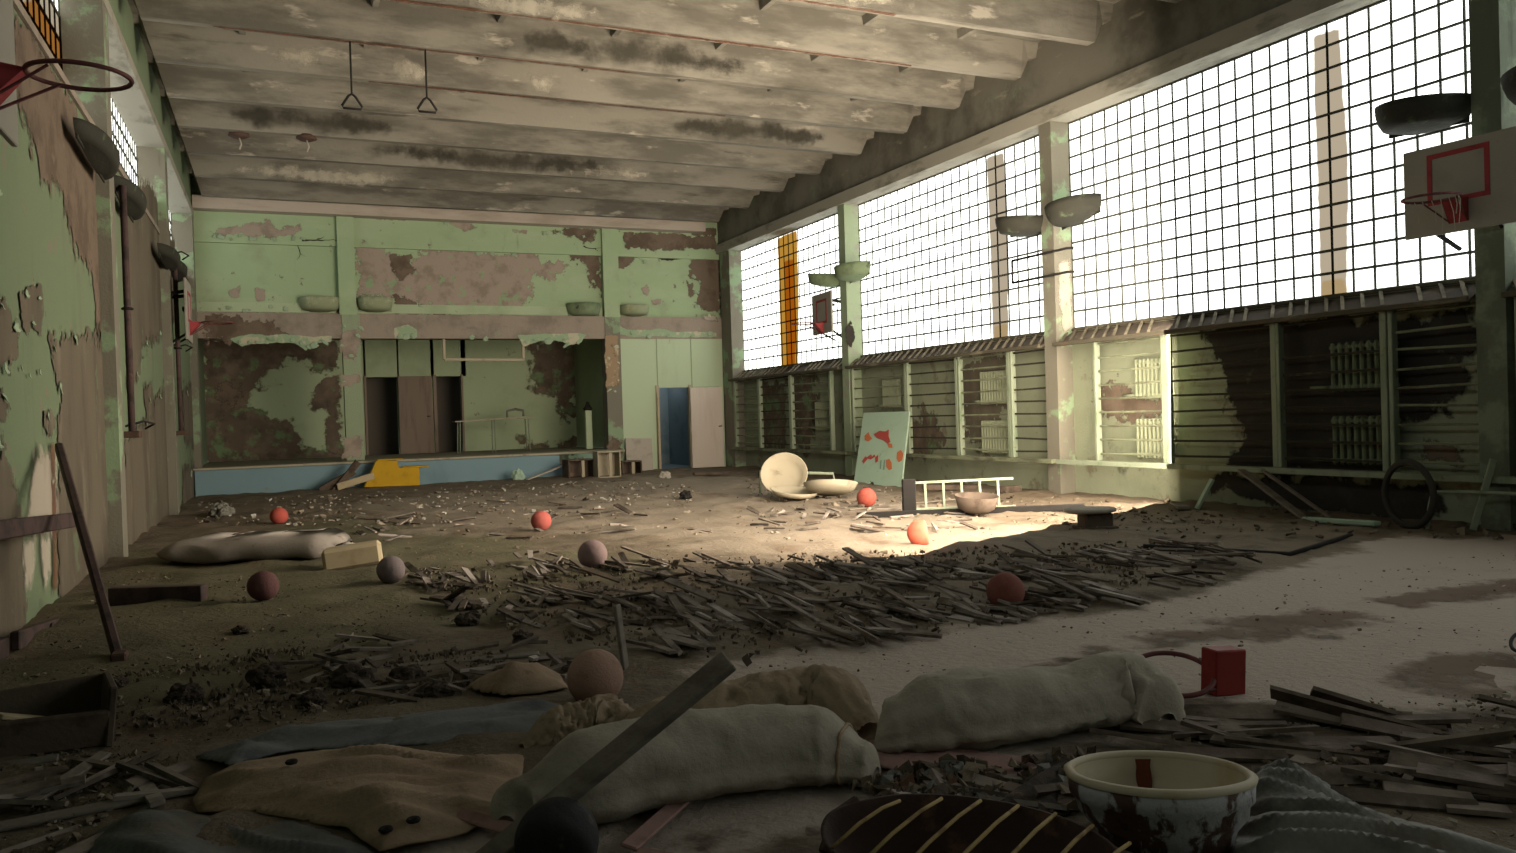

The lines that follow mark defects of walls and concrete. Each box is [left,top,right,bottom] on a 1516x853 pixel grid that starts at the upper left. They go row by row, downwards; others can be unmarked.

leakage [479,0,596,19]
leakage [531,36,728,67]
leakage [678,120,821,142]
peeling [355,248,568,340]
peeling [618,257,721,321]
peeling [124,180,195,545]
peeling [518,333,586,348]
peeling [604,335,620,392]
peeling [0,279,110,598]
peeling [0,536,28,638]
leakage [1132,579,1516,647]
leakage [1388,652,1516,698]